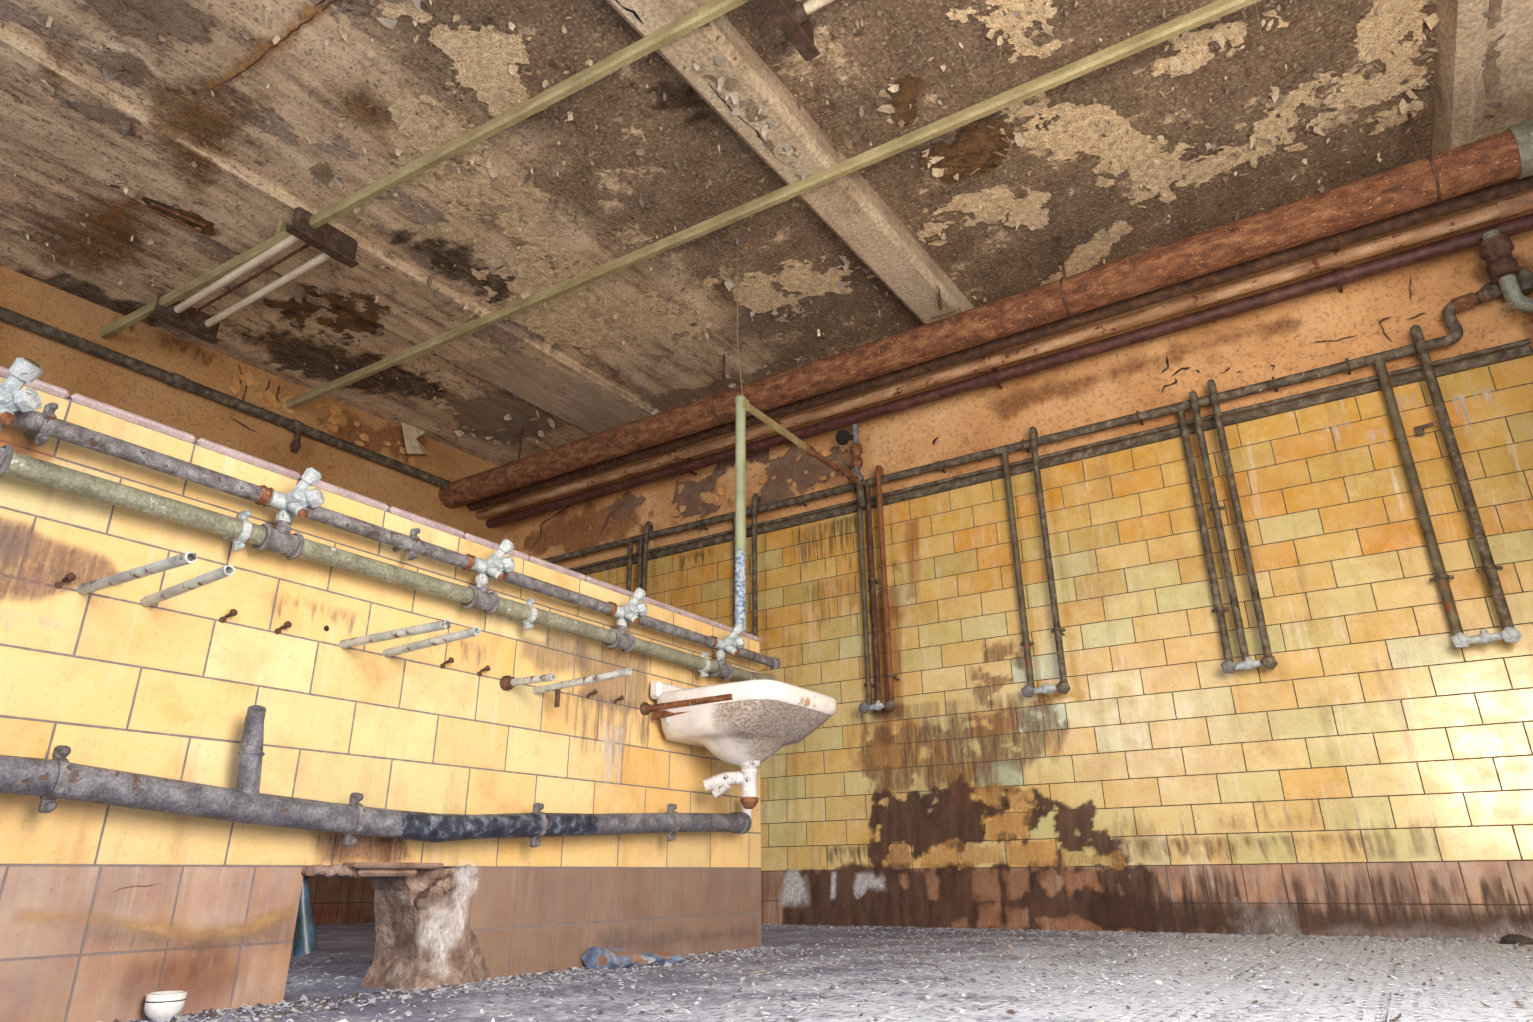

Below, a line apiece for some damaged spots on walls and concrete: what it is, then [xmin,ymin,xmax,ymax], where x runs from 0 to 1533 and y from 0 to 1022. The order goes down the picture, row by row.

peeling [23,79,197,179]
peeling [754,0,1439,286]
leakage [18,201,156,329]
spalling [5,173,272,287]
leakage [0,520,113,598]
leakage [782,646,1533,939]
spalling [886,783,1126,931]